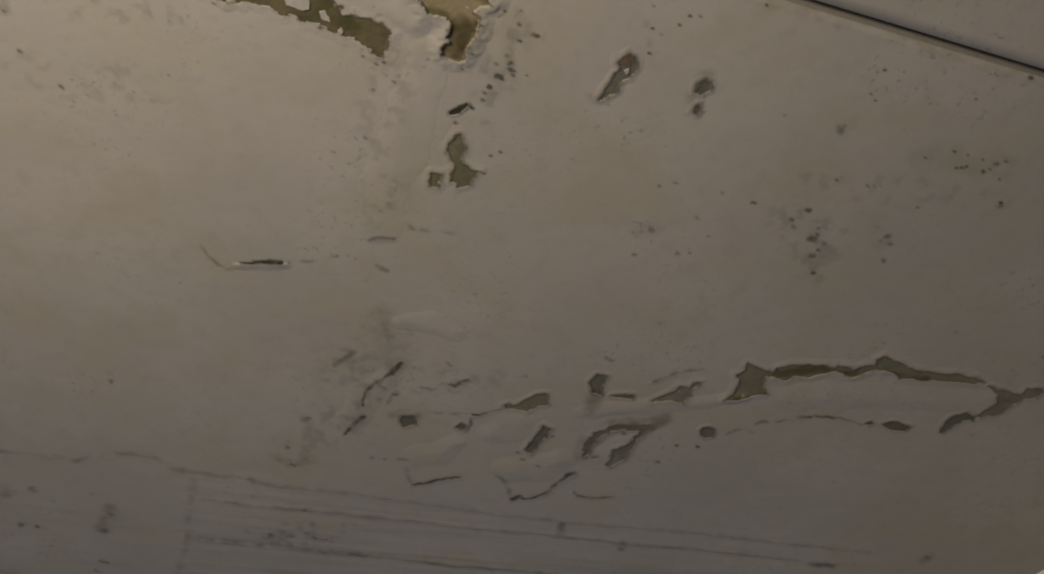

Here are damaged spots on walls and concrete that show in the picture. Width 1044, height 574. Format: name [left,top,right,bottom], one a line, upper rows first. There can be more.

peeling [197,0,404,66]
peeling [399,0,511,74]
peeling [590,45,651,106]
peeling [685,74,719,120]
peeling [420,100,502,195]
crack [231,260,293,271]
peeling [394,411,421,430]
peeling [498,388,559,459]
peeling [578,419,659,470]
peeling [583,369,708,407]
spalling [695,423,719,448]
peeling [716,349,1044,437]